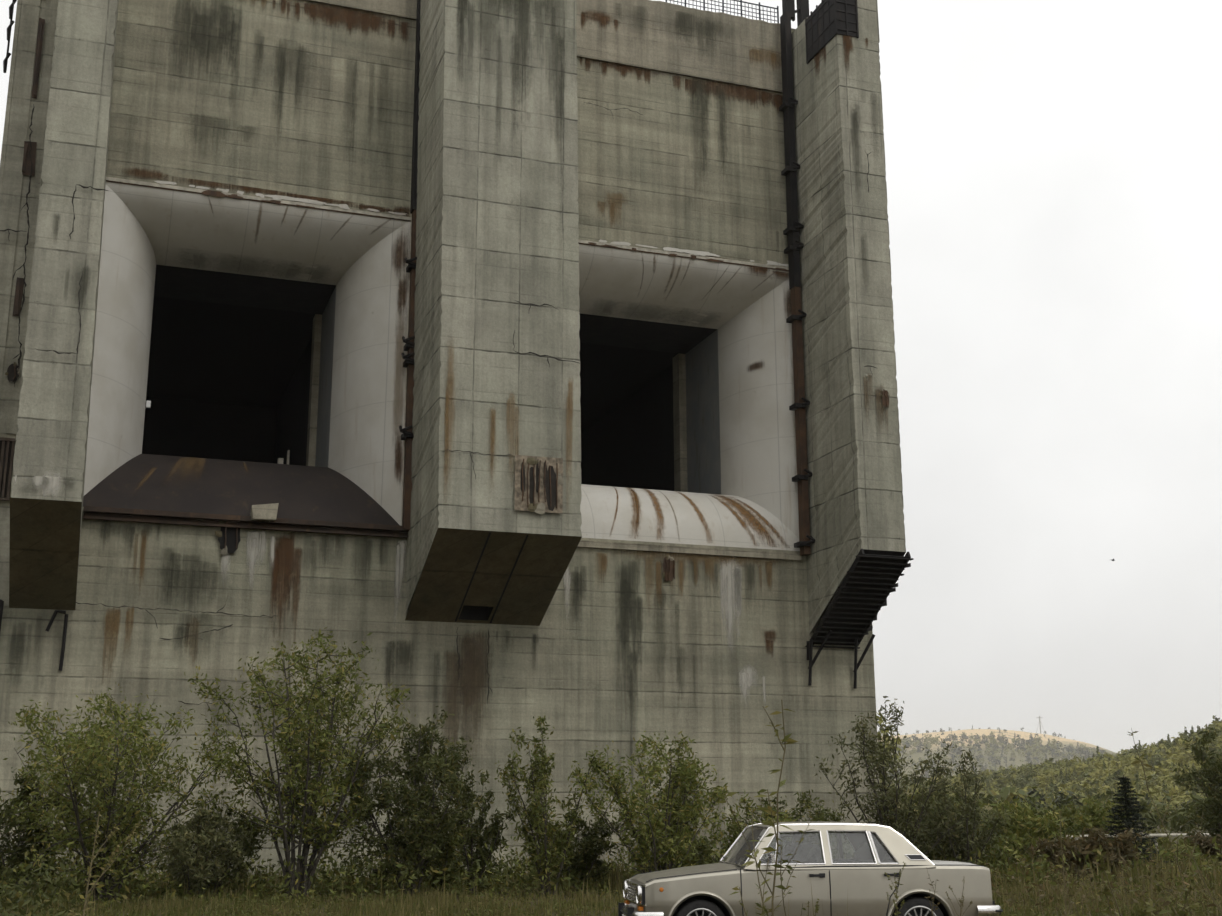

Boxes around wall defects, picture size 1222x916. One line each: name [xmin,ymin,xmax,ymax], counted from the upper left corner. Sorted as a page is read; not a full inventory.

corrosion [273,0,408,38]
corrosion [581,12,618,28]
corrosion [580,58,650,81]
corrosion [673,76,782,108]
crack [0,104,83,387]
corrosion [393,236,408,308]
corrosion [612,487,663,532]
corrosion [678,492,710,536]
corrosion [714,495,786,544]
corrosion [272,533,301,625]
corrosion [764,631,775,651]